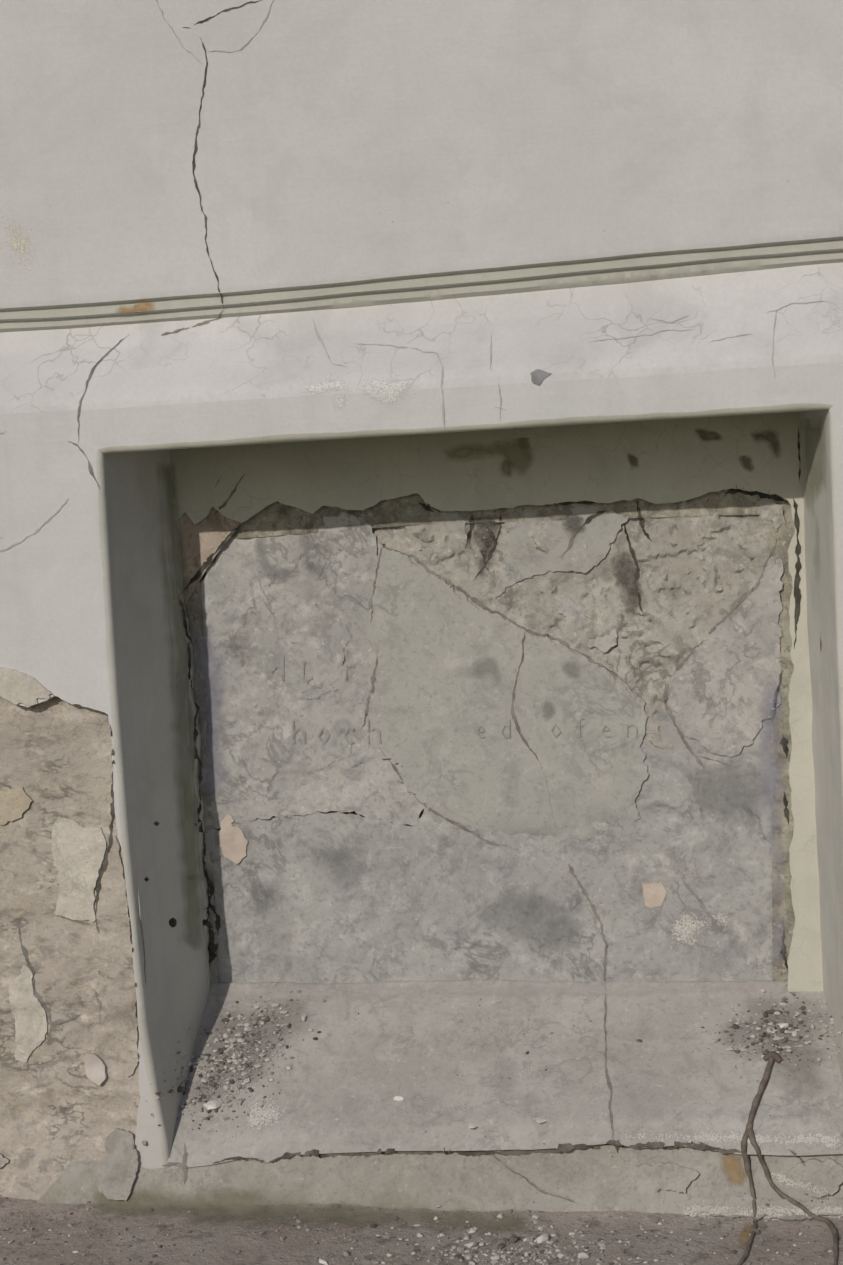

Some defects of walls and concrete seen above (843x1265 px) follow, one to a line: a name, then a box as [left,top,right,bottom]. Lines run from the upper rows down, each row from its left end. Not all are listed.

crack [156,0,274,335]
crack [68,337,126,489]
crack [312,318,445,429]
crack [592,300,826,372]
crack [361,658,508,846]
spalling [179,498,786,983]
crack [370,542,623,816]
crack [562,501,652,612]
crack [663,540,788,769]
spalling [0,666,149,1201]
crack [162,864,741,1204]
spalling [636,1158,843,1222]